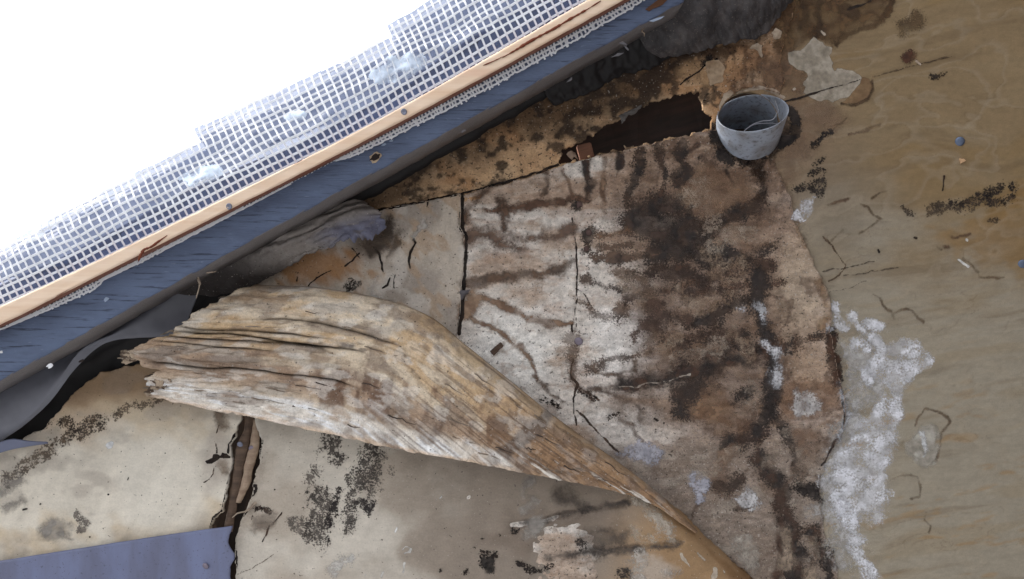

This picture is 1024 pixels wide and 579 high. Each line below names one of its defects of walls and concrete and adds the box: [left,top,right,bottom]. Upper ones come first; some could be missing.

peeling [706,31,874,110]
crack [296,163,559,335]
damp [459,160,606,252]
crack [571,218,591,332]
damp [458,259,574,402]
damp [576,104,934,579]
crack [227,429,263,455]
crack [539,362,619,453]
damp [287,433,394,557]
damp [463,538,498,575]
damp [499,490,630,536]
damp [515,530,681,579]